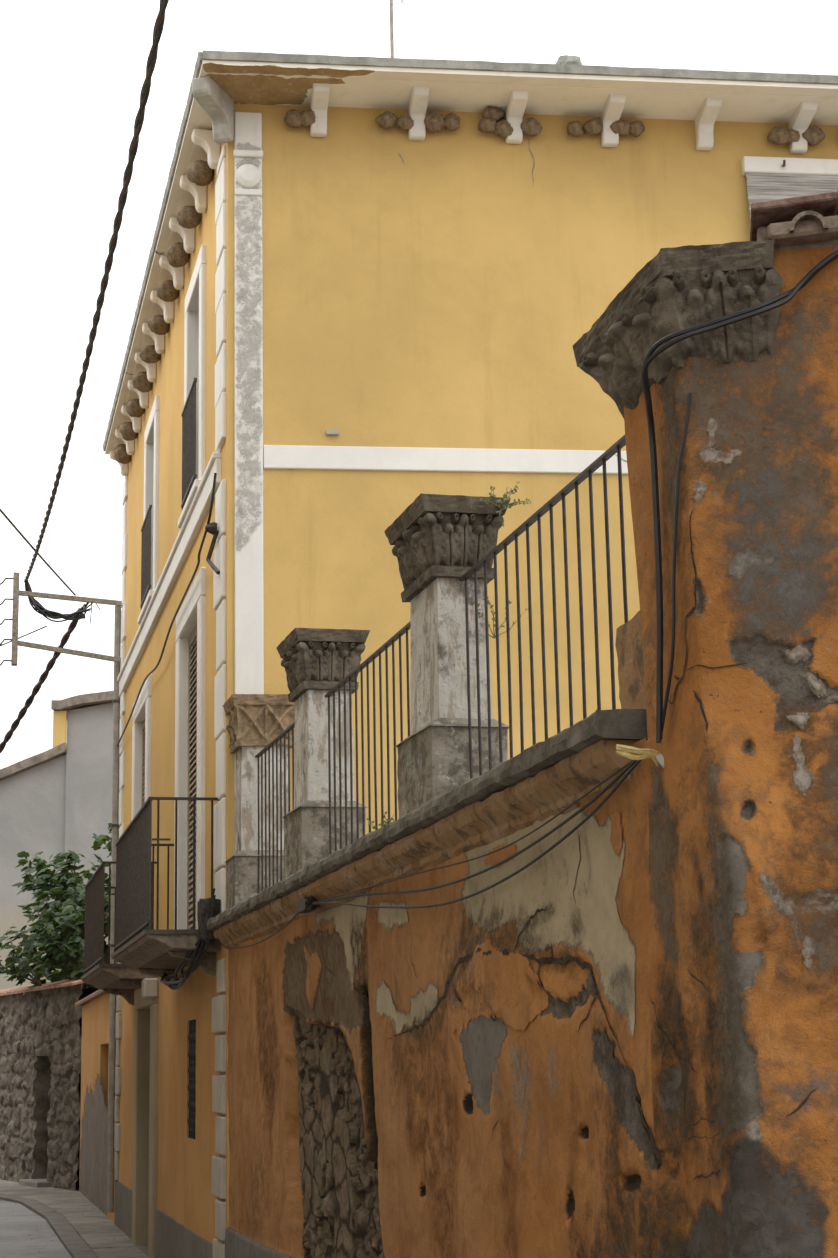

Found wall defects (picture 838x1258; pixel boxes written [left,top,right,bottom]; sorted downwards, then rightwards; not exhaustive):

spalling [203,62,374,105]
peeling [699,417,742,464]
leakage [657,303,838,642]
crack [668,509,750,733]
spalling [726,632,838,796]
spalling [282,891,458,1036]
spalling [459,1014,507,1115]
crack [388,908,663,1166]
peeling [461,807,636,1039]
spalling [591,1027,658,1172]
leakage [569,748,829,1258]
crack [694,1169,721,1179]